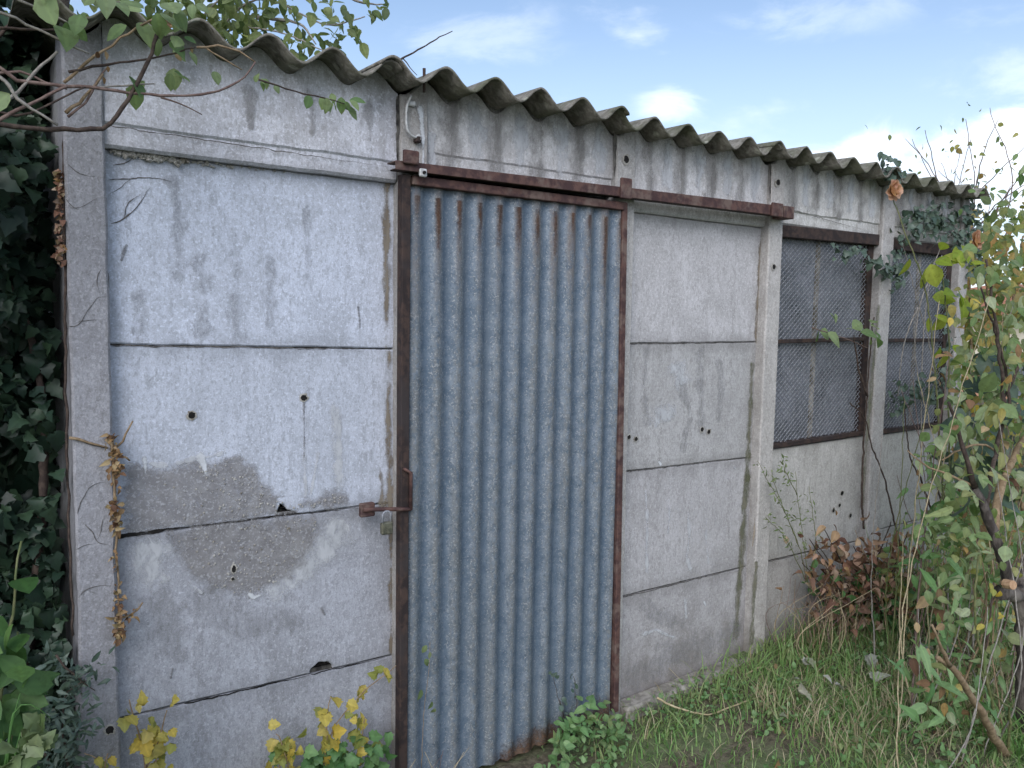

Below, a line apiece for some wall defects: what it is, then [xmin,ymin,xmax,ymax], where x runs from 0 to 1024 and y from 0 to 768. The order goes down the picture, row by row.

rust [382,183,391,321]
rust [378,386,394,507]
leakage [134,540,173,583]
crack [76,482,349,550]
peeling [123,451,348,599]
leakage [262,520,350,599]
crack [145,659,378,712]